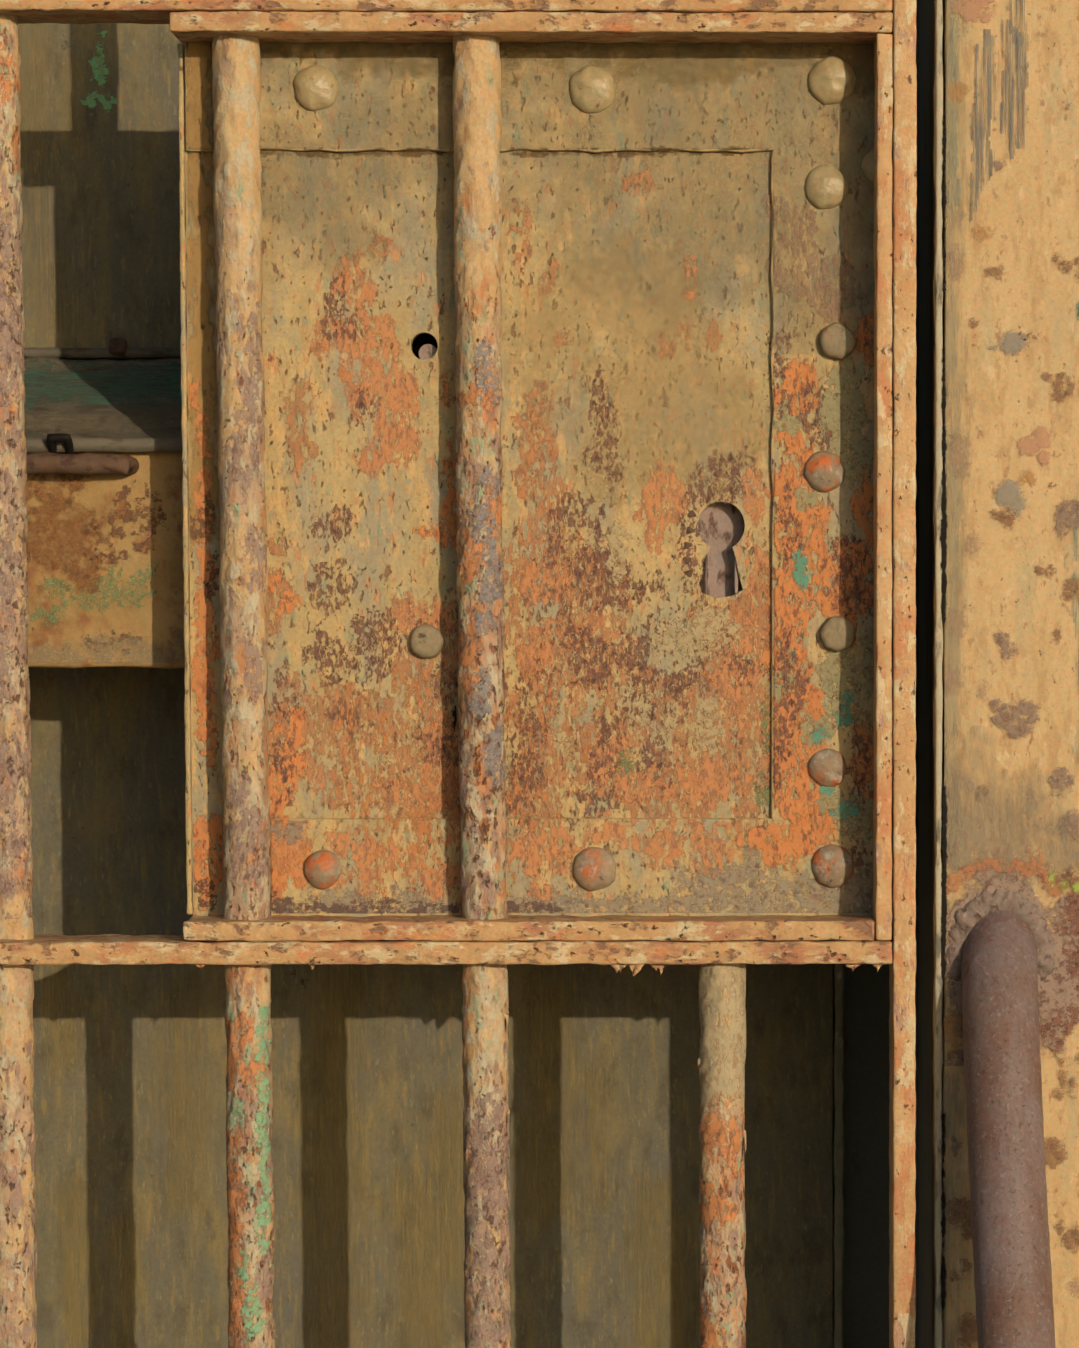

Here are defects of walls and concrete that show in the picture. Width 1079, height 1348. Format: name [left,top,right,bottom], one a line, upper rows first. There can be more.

peeling [80,30,118,112]
rust [0,428,169,919]
rust [186,41,874,914]
rust [943,849,1079,1100]